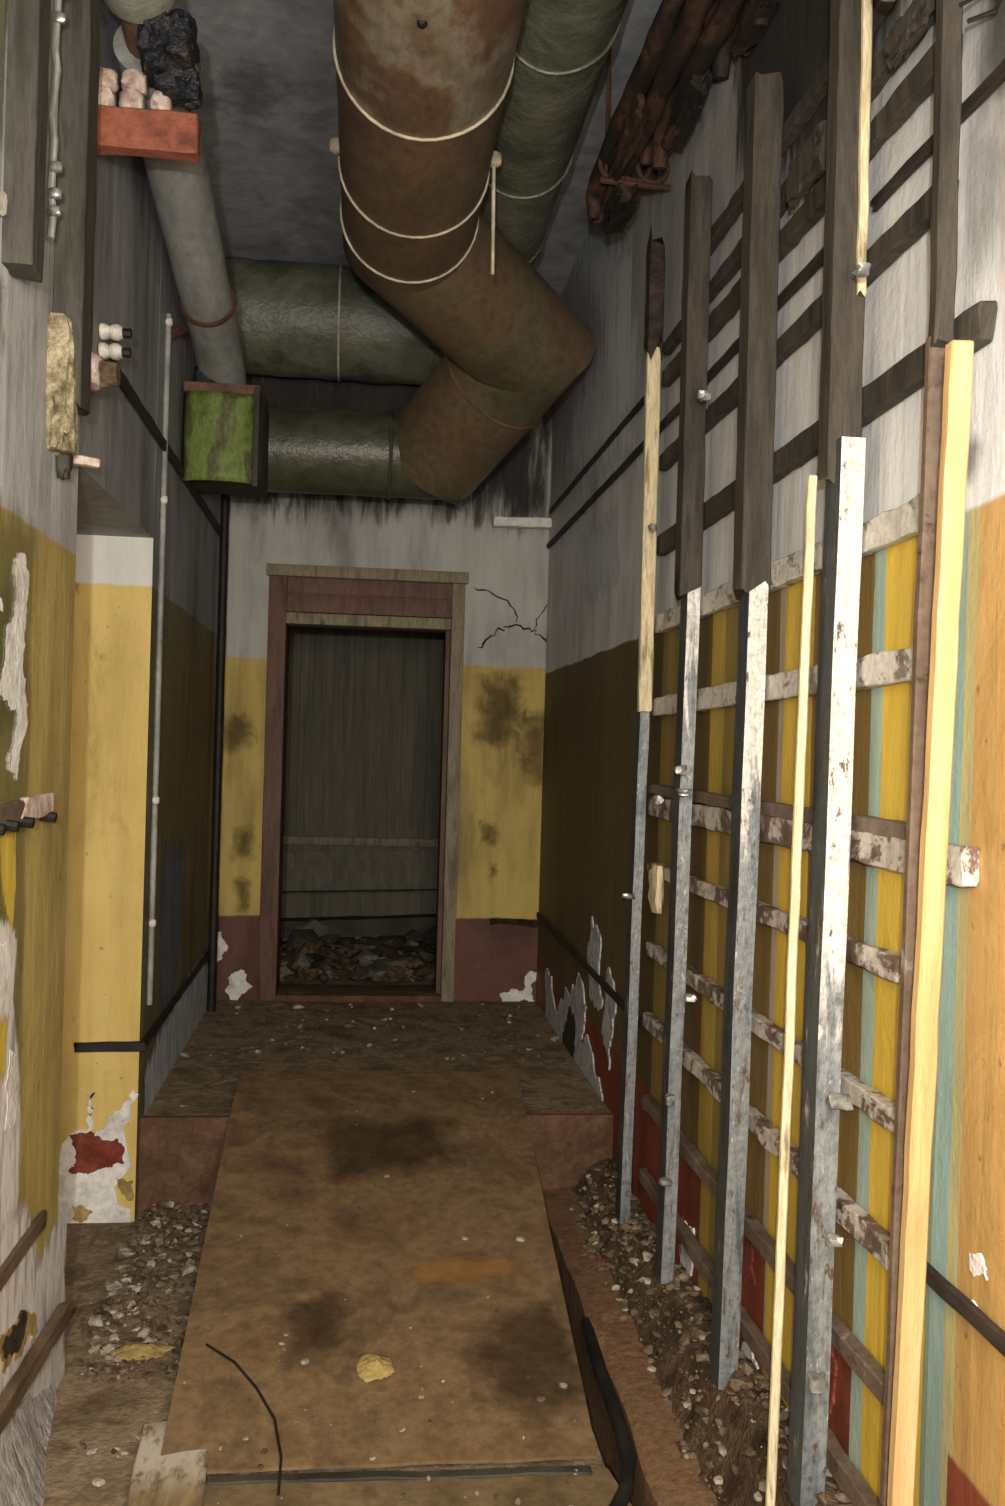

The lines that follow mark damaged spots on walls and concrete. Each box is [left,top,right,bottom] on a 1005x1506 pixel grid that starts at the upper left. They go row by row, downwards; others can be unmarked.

peeling [0,552,29,779]
crack [474,587,547,648]
peeling [0,831,22,1242]
peeling [217,931,252,1000]
peeling [490,918,538,928]
peeling [500,916,617,1101]
peeling [58,1090,139,1223]
spalling [0,1310,38,1374]